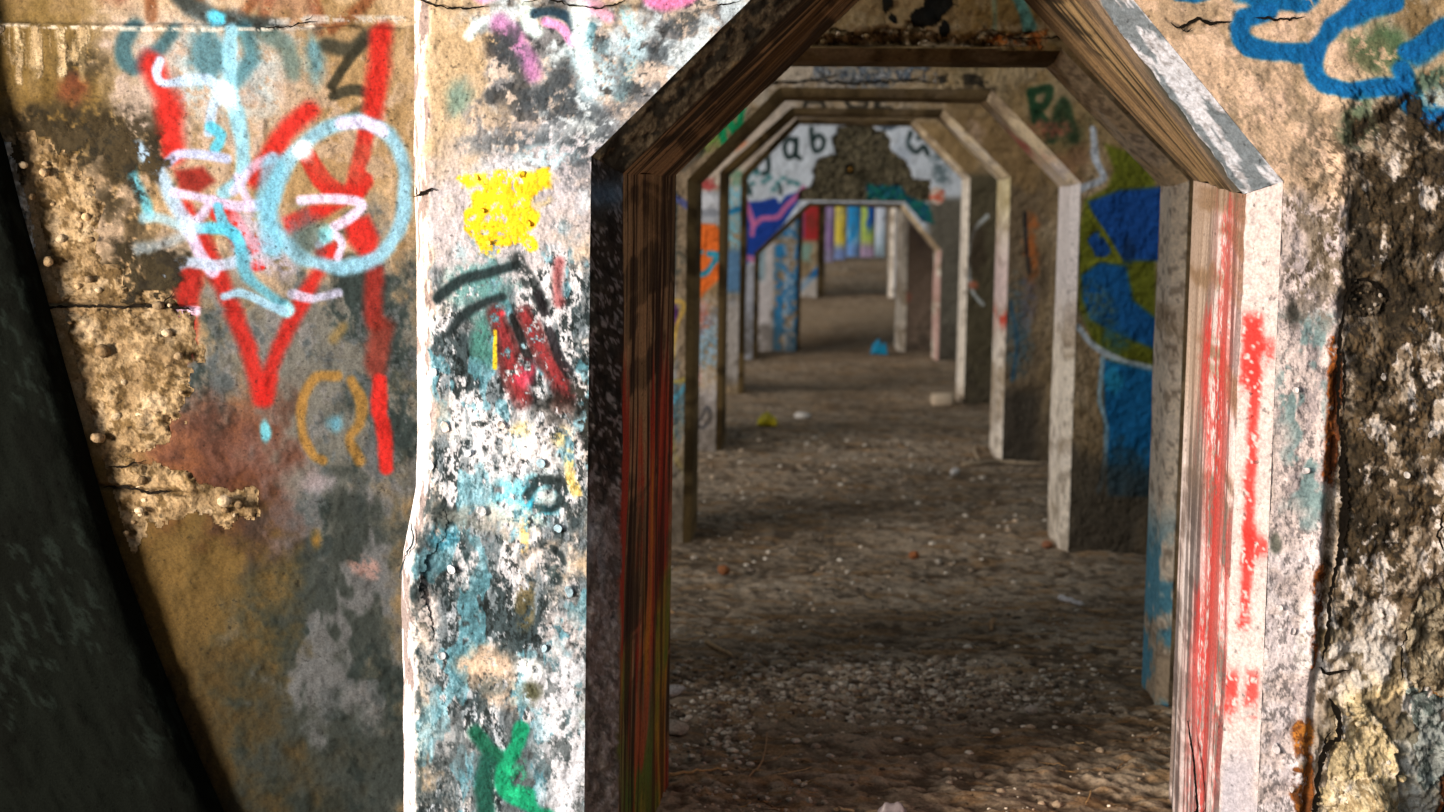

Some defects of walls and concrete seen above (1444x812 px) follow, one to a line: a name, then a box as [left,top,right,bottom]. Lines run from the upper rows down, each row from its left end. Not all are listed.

crack [417,0,489,10]
crack [524,0,624,9]
spalling [813,20,1041,47]
crack [1171,16,1303,32]
spalling [1344,280,1388,317]
spalling [4,130,260,554]
leakage [1320,92,1444,658]
crack [1311,245,1391,812]
spalling [1317,582,1444,812]